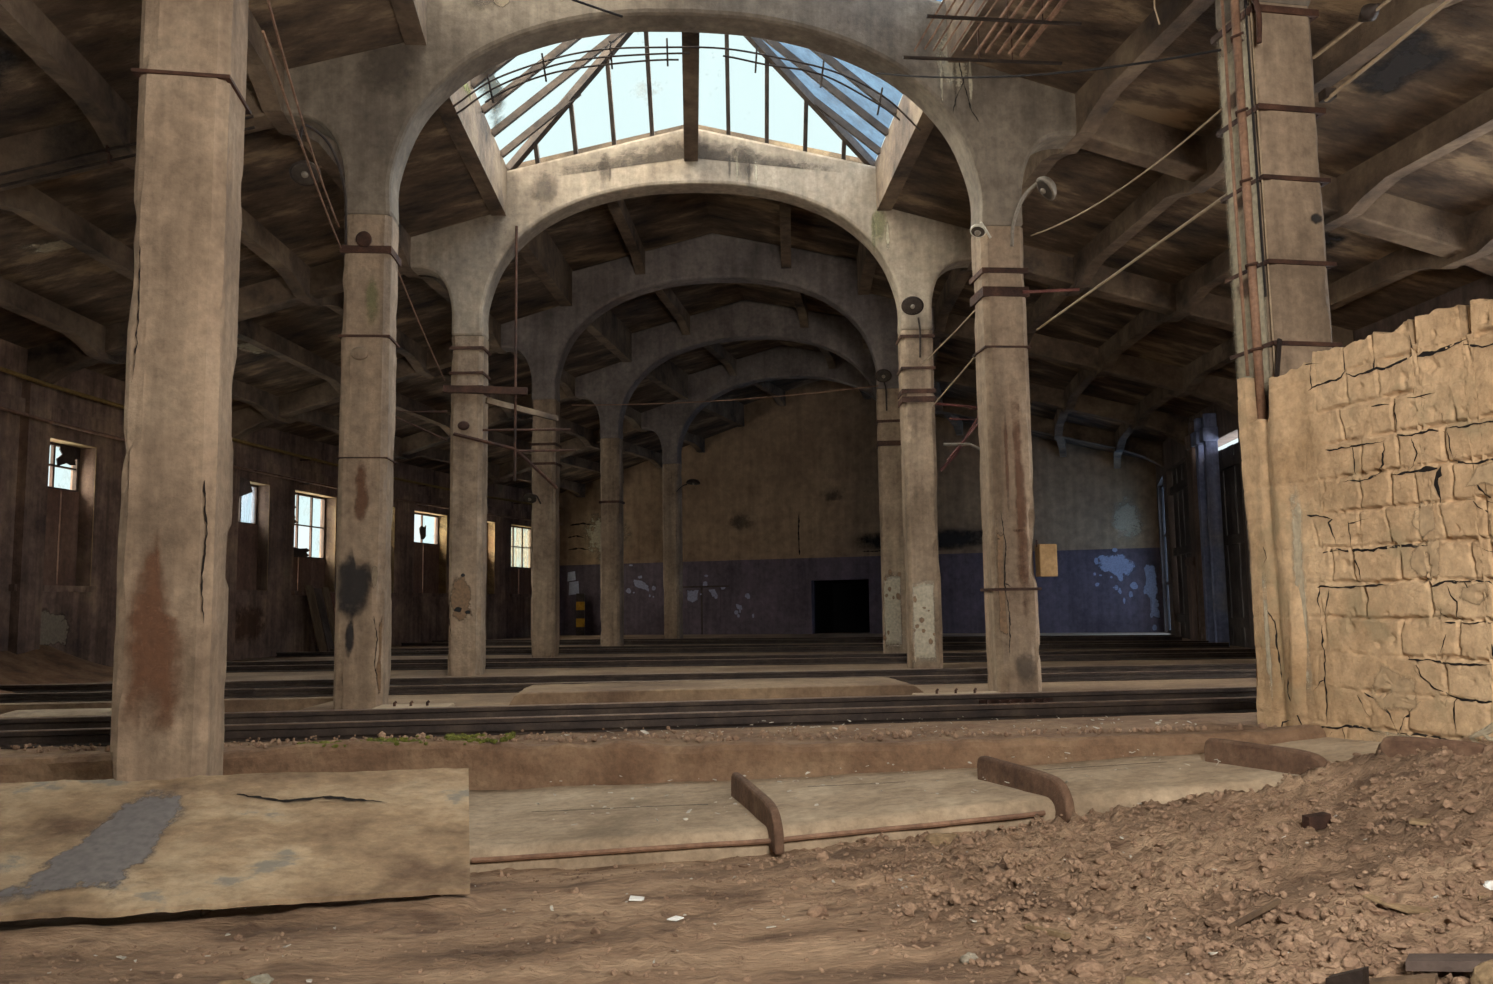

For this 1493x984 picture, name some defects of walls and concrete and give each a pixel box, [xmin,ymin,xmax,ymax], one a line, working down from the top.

crack [1305,336,1493,512]
peeling [1093,548,1160,631]
crack [1267,515,1493,740]
peeling [0,790,183,900]
crack [236,794,382,802]